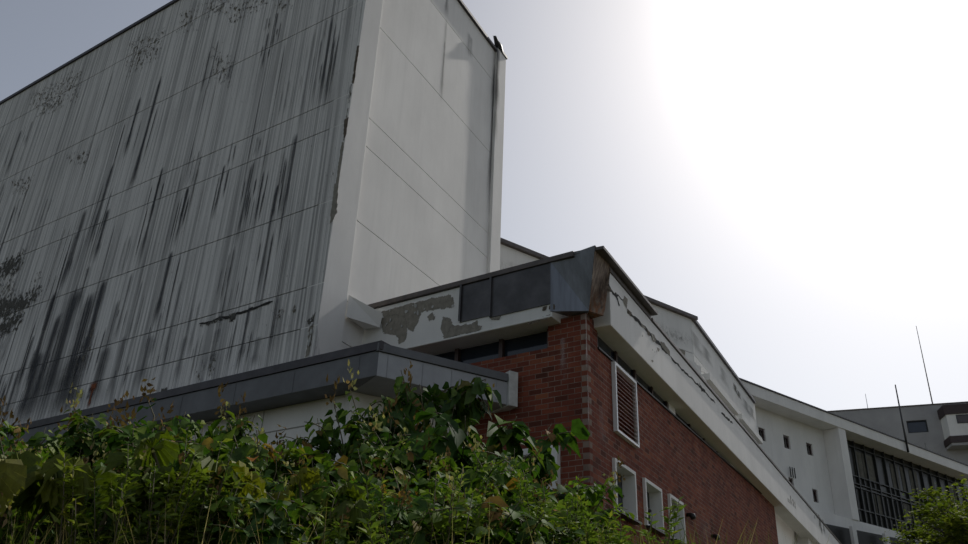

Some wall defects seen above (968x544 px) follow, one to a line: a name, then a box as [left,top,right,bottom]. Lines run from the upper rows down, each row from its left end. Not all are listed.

damp [168,7,246,238]
damp [239,1,297,284]
damp [310,22,339,96]
damp [491,50,499,157]
damp [0,81,164,416]
damp [156,254,181,334]
damp [229,308,252,357]
crack [199,301,296,326]
peeling [381,295,471,344]
crack [608,285,733,424]